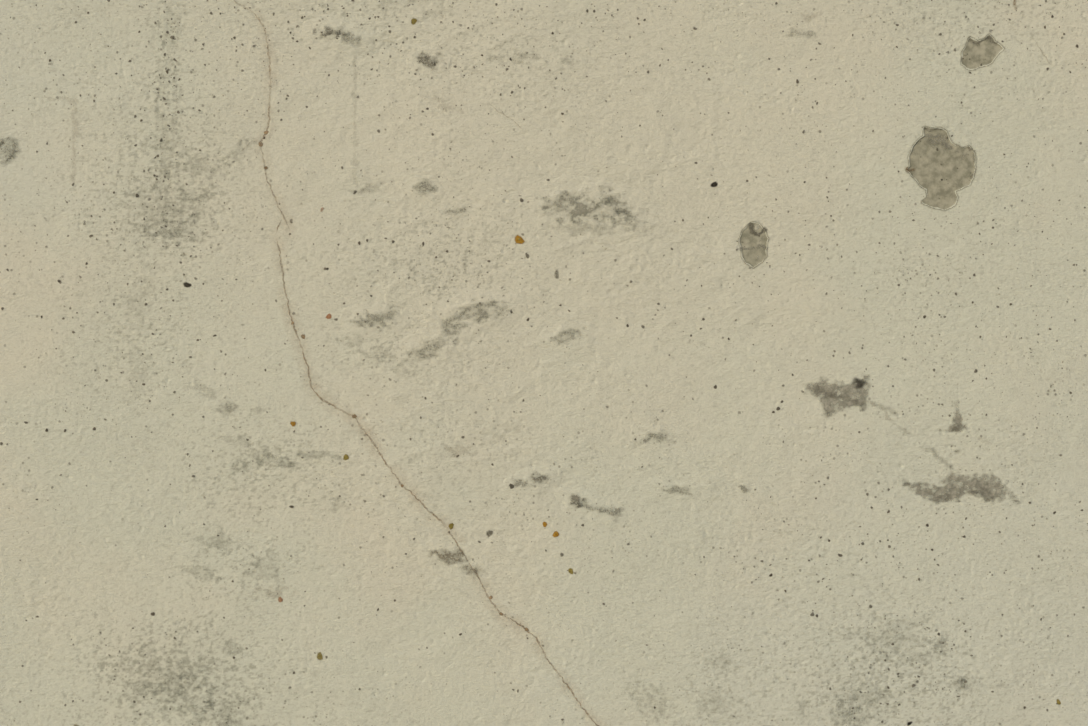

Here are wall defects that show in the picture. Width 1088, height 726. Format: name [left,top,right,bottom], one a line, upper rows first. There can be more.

peeling [960,32,1005,72]
peeling [905,125,978,213]
peeling [738,220,770,268]
spalling [807,376,868,414]
spalling [906,466,1005,502]